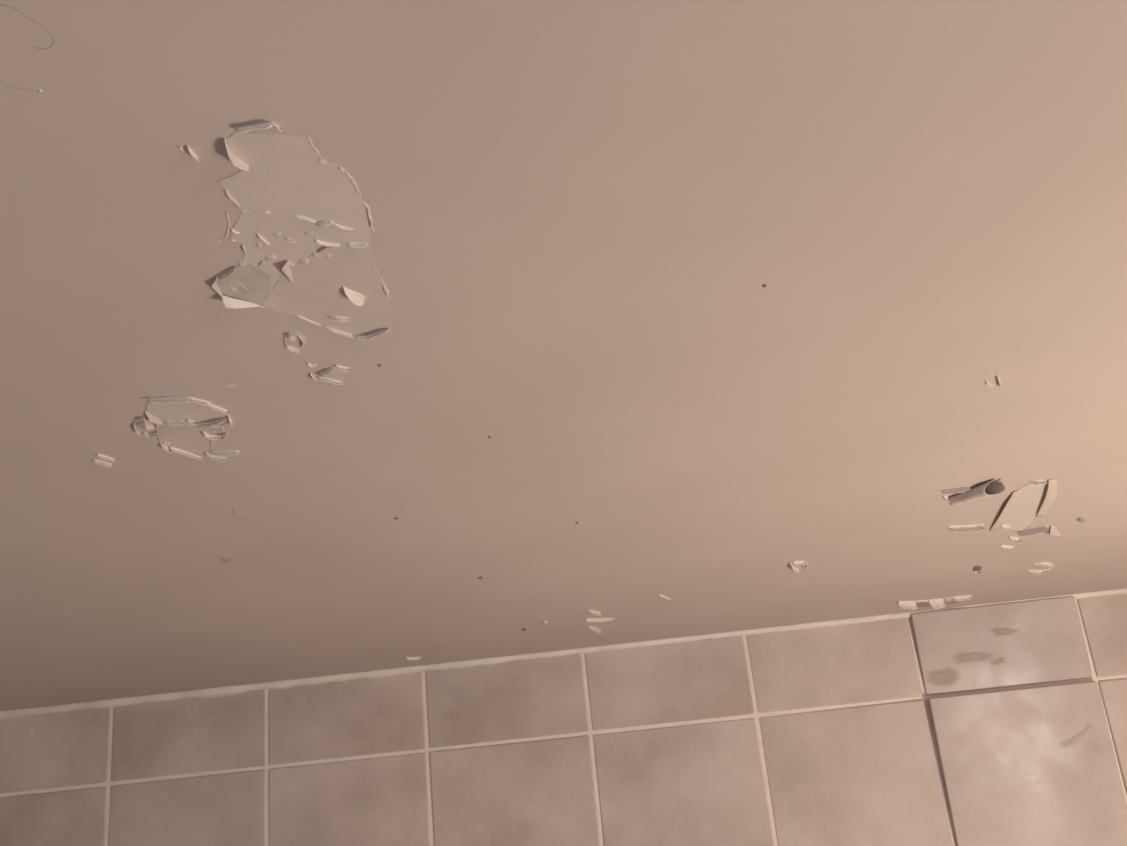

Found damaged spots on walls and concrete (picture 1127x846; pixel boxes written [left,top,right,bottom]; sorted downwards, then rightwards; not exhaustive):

peeling [211,122,391,340]
peeling [307,363,350,385]
peeling [93,454,116,467]
peeling [132,397,239,462]
peeling [941,478,1061,549]
peeling [1028,562,1055,574]